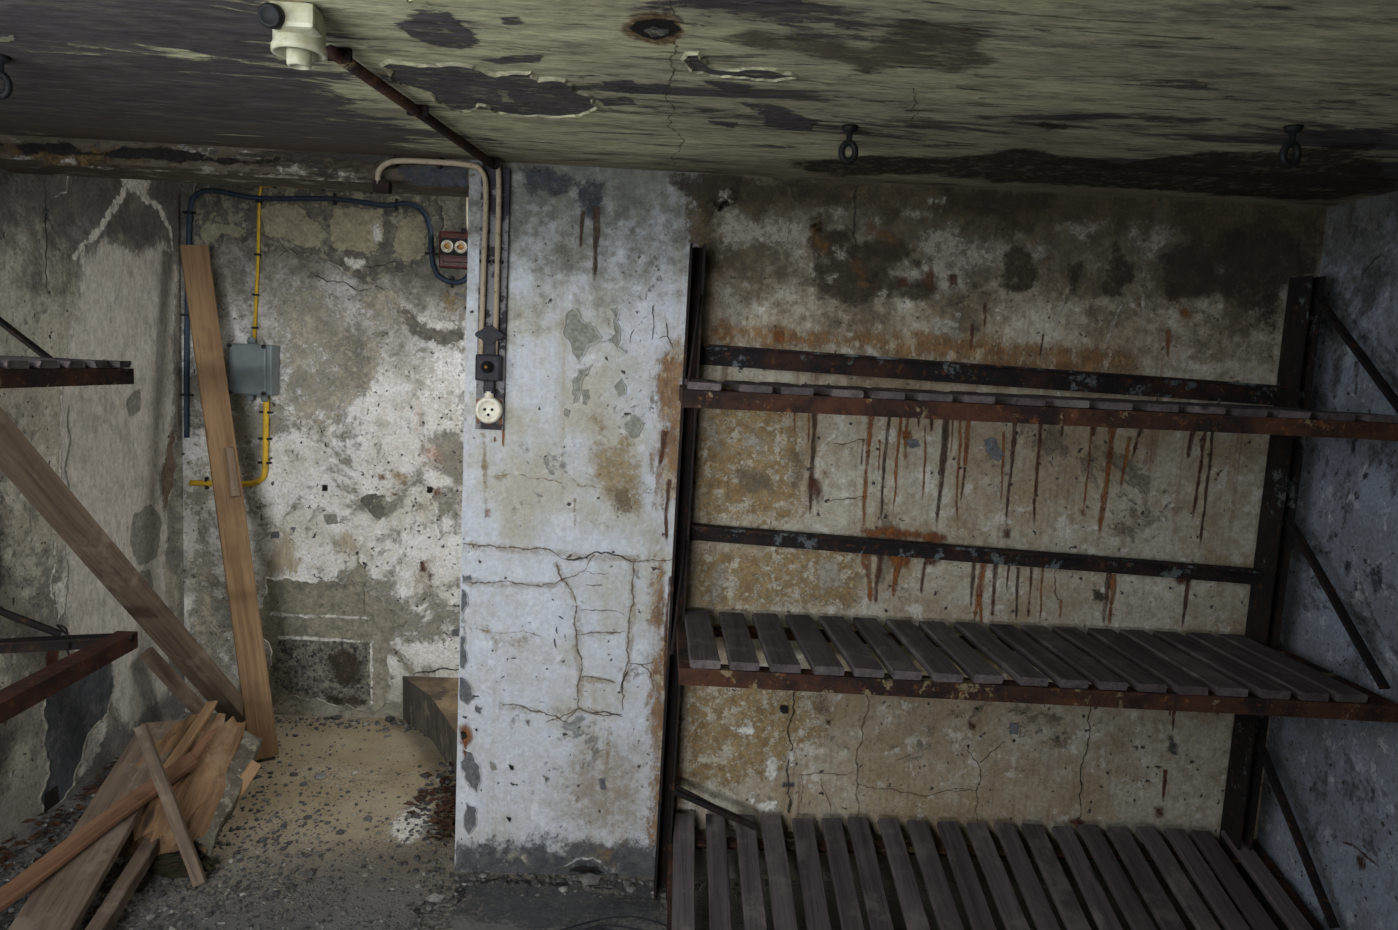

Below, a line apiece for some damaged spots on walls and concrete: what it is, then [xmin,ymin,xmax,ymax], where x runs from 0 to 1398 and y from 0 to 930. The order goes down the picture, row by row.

peeling [379,9,670,118]
crack [665,0,754,164]
peeling [623,13,817,131]
efflorescence [72,179,173,274]
peeling [189,164,446,288]
leakage [670,144,1398,343]
corrosion [650,339,684,539]
corrosion [779,413,826,510]
corrosion [860,416,971,602]
flaking render [259,555,408,717]
crack [462,543,672,722]
corrosion [646,554,686,846]